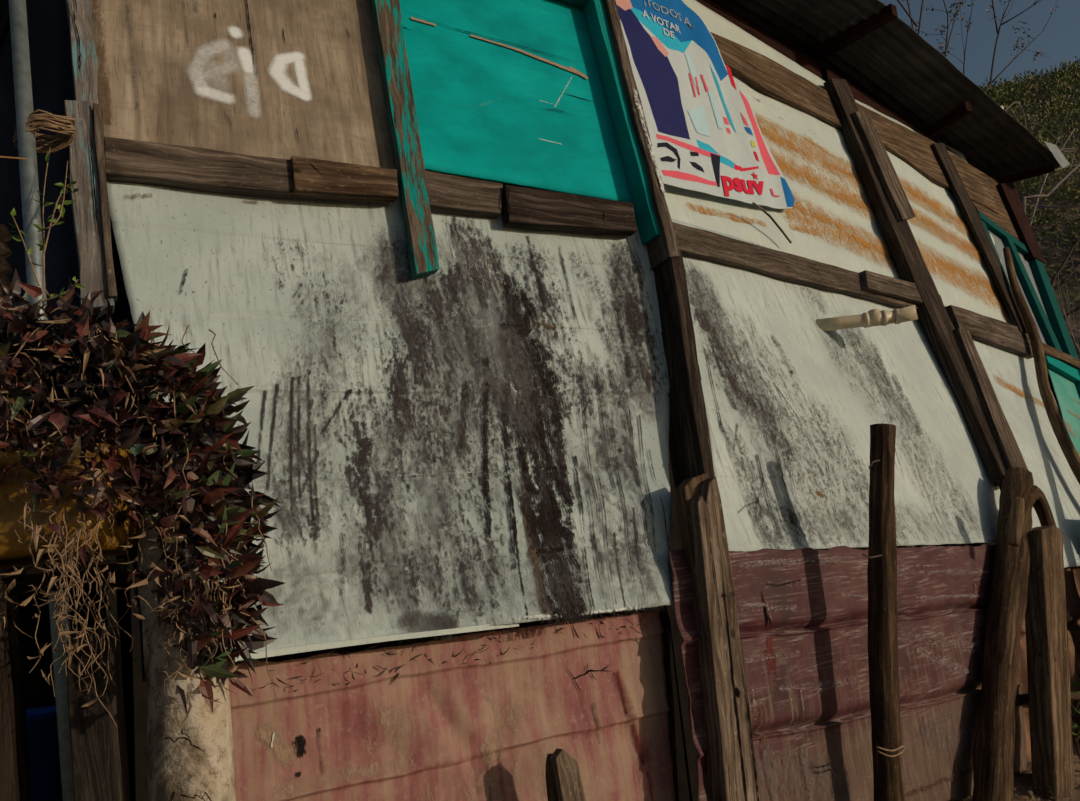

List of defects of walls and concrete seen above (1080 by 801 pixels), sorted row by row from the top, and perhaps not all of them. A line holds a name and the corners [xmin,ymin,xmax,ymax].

rust [754,97,899,273]
rust [897,175,1011,322]
leakage [258,217,670,626]
leakage [685,264,869,551]
leakage [827,328,978,529]
peeling [755,746,849,801]